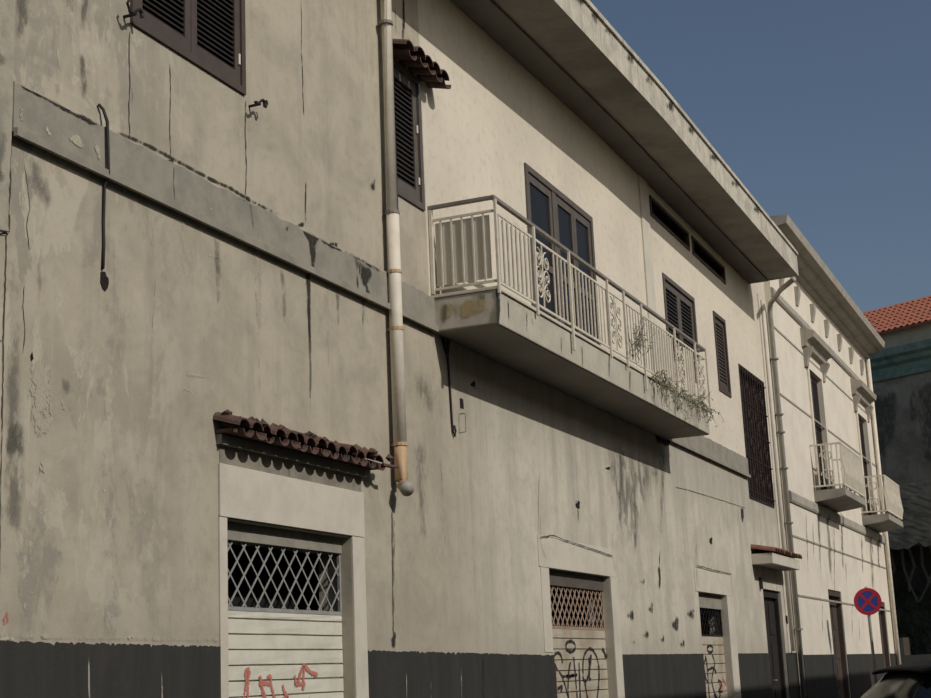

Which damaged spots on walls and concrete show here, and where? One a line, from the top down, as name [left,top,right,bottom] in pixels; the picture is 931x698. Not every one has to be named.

crack [126,34,134,130]
water stain [299,192,379,397]
water stain [871,393,896,460]
water stain [612,456,648,545]